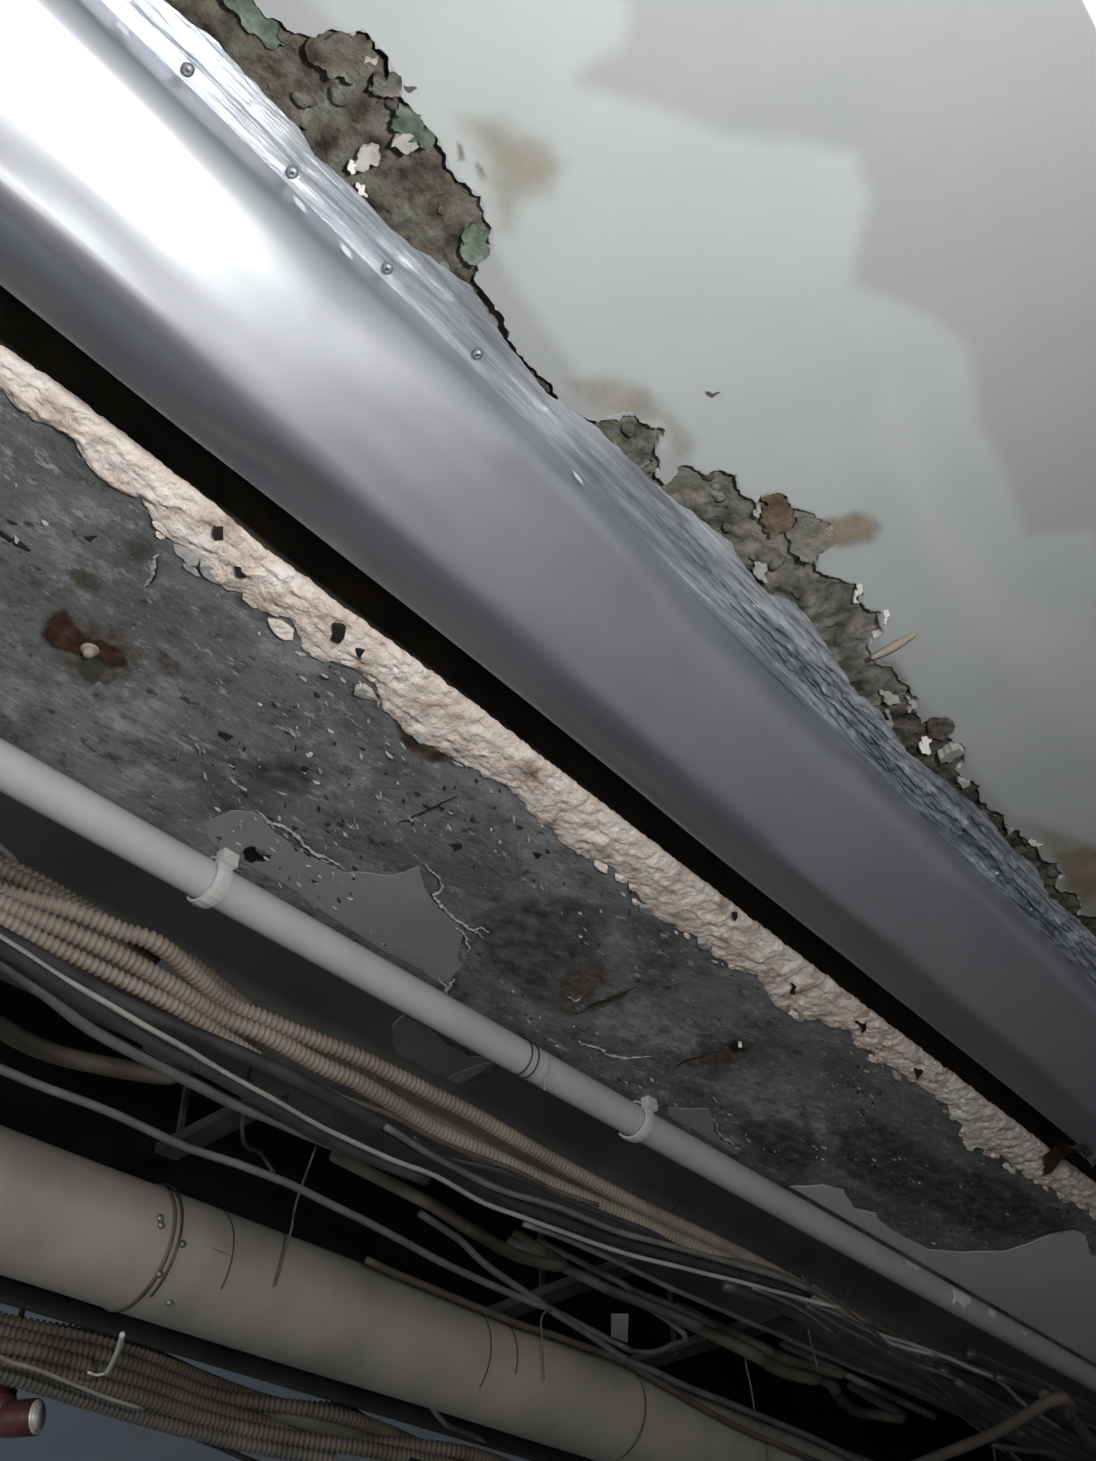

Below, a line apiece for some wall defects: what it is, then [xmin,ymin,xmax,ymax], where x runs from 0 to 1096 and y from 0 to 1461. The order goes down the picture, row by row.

flaking render [164,0,491,293]
water stain [829,516,872,543]
water stain [238,596,272,621]
rust [42,611,135,685]
water stain [333,768,371,817]
flaking render [0,345,1096,1364]